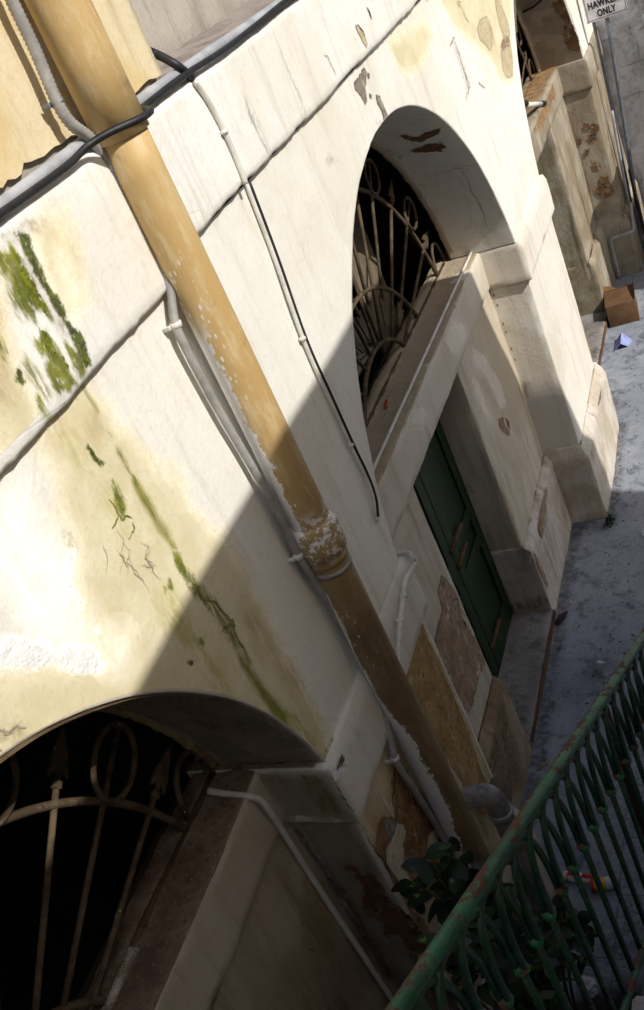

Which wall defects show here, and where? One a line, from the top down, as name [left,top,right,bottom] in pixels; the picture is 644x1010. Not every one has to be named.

peeling [458,0,513,78]
peeling [516,0,582,72]
peeling [354,67,388,119]
peeling [402,129,446,153]
crack [103,530,161,585]
damp [0,390,328,764]
crack [0,724,26,752]
damp [267,776,344,819]
peeling [295,736,446,991]